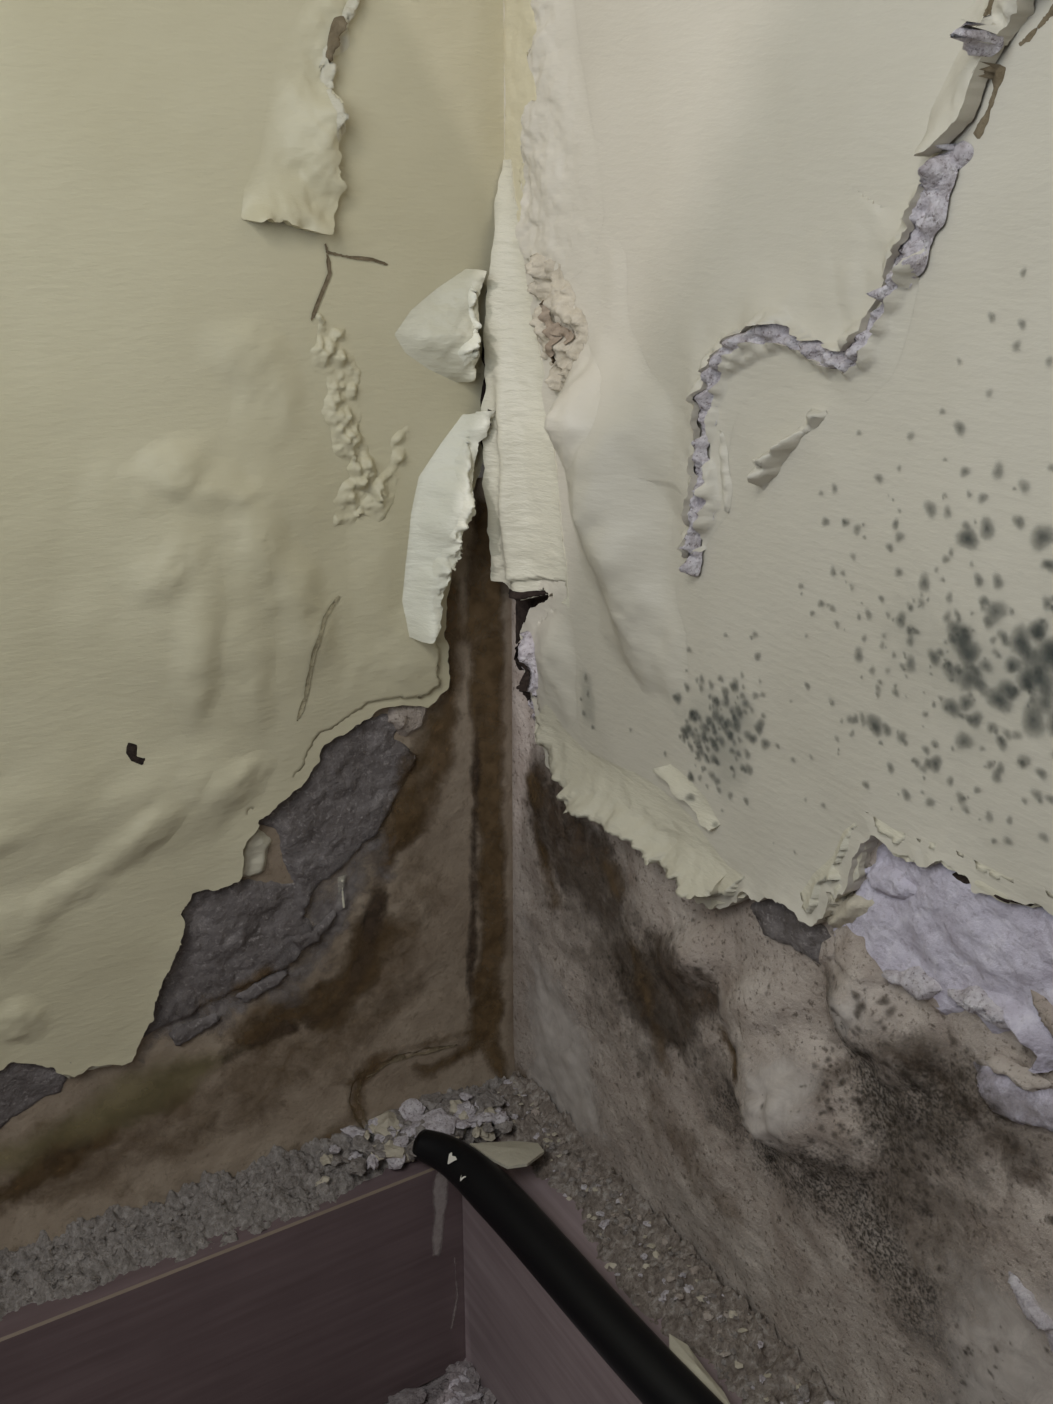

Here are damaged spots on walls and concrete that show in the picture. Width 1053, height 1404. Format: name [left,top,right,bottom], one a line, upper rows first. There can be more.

crack [311,244,388,321]
crack [637,154,958,577]
leakage [0,1062,207,1200]
leakage [200,968,273,1018]
peeling [0,0,604,1252]
leakage [224,501,599,1136]
leakage [527,762,718,1074]
peeling [512,599,1053,1404]
leakage [716,994,1053,1404]
leakage [961,525,989,544]
leakage [947,626,1003,744]
leakage [992,623,1053,728]